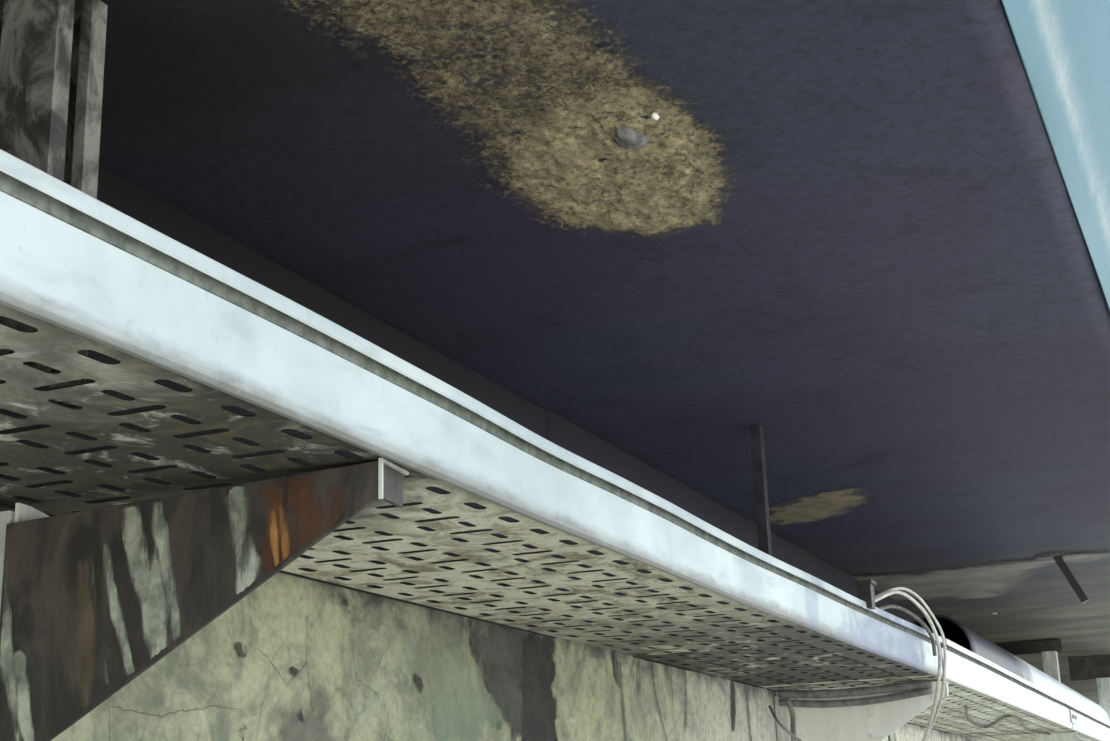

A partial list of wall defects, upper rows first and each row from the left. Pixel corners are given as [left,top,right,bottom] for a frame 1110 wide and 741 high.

spalling [284,0,738,239]
spalling [769,488,865,525]
damp [471,623,558,741]